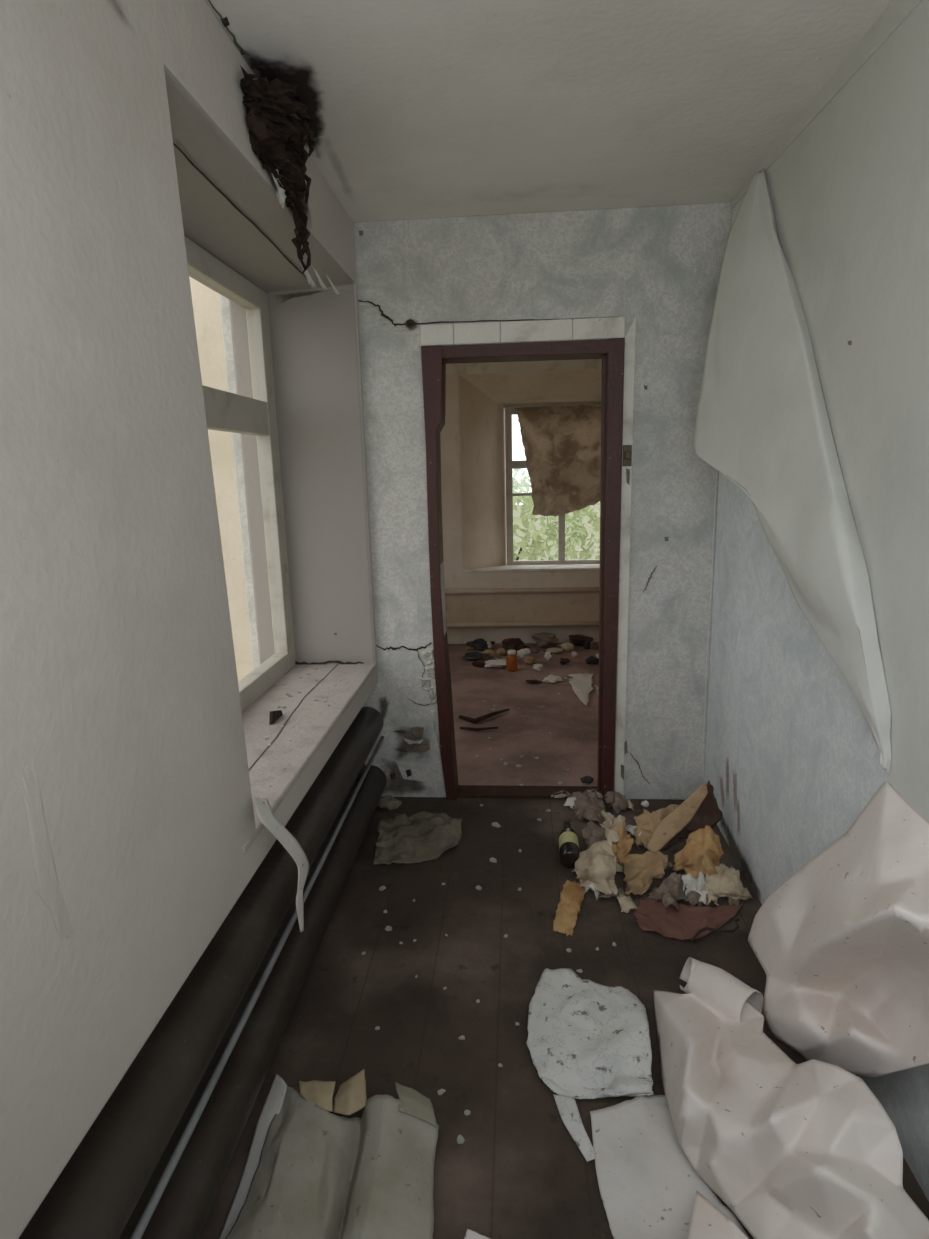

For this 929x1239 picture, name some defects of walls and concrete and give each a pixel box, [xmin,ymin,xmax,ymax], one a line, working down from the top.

crack [358,300,606,331]
crack [249,643,432,770]